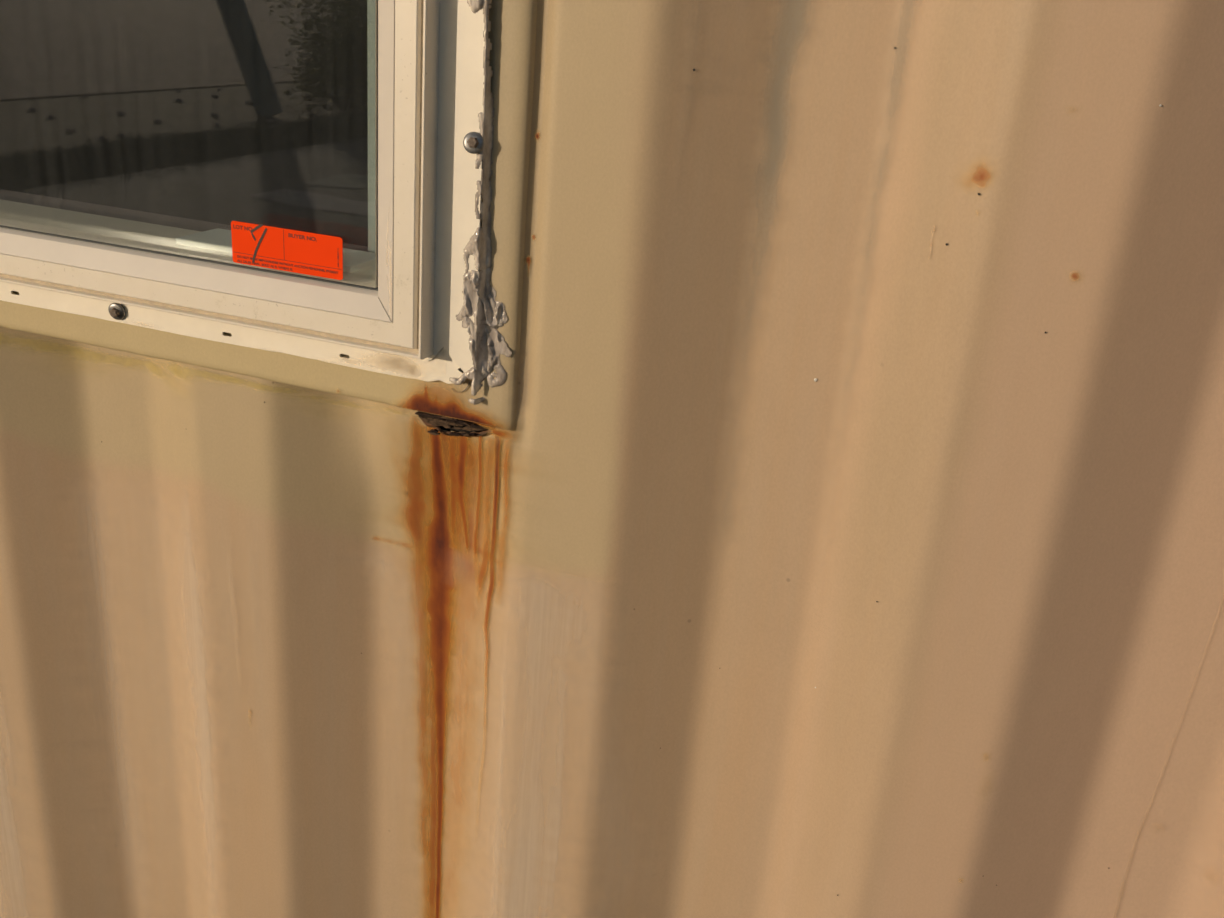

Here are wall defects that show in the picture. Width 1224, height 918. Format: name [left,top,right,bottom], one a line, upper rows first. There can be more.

water stain [753,0,811,268]
rust [972,167,990,186]
rust [402,386,511,918]